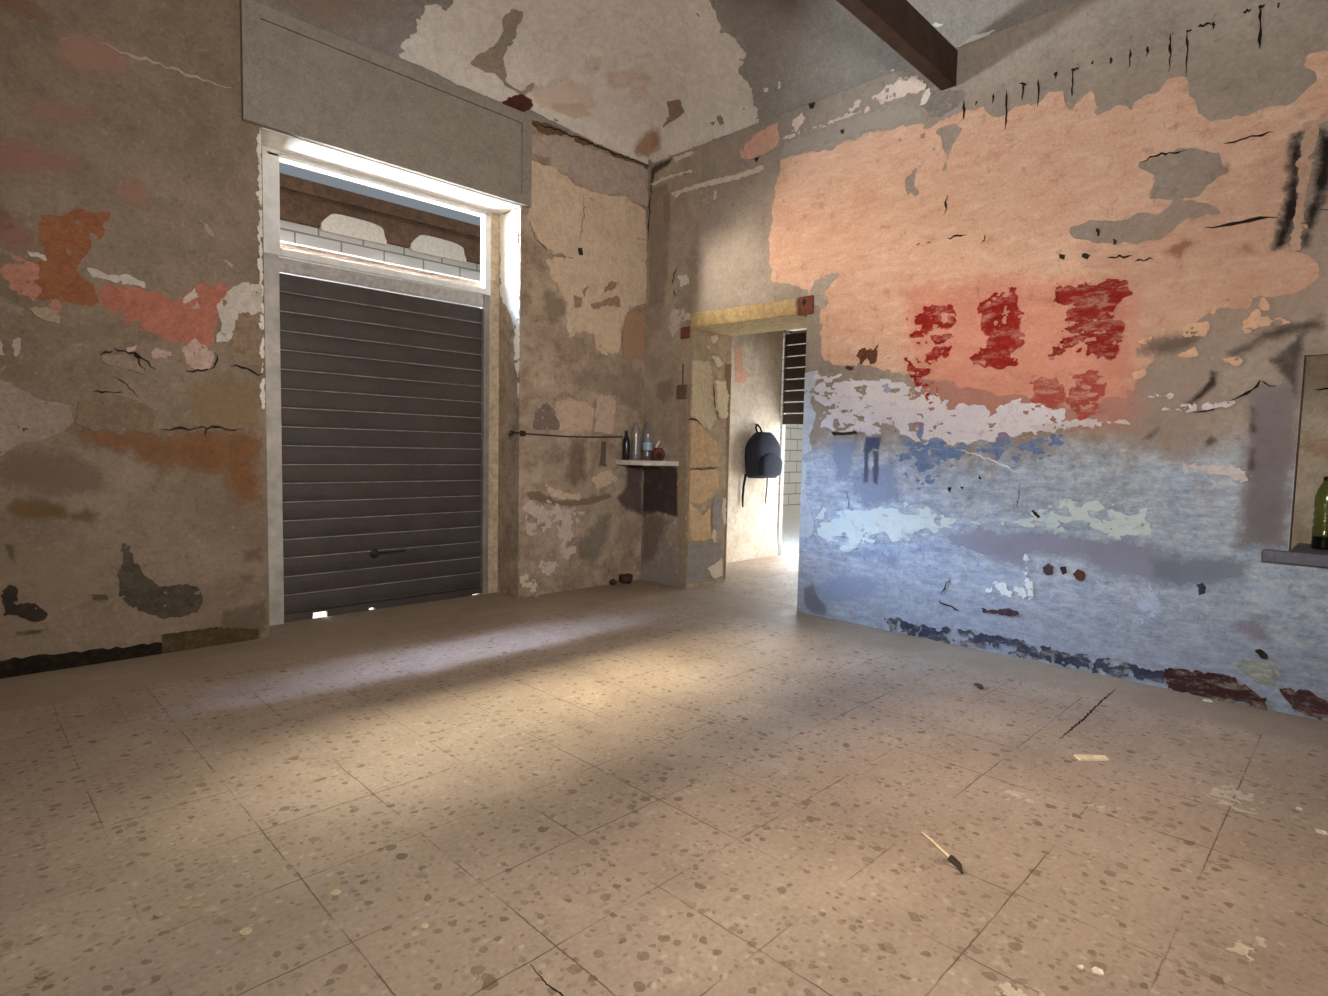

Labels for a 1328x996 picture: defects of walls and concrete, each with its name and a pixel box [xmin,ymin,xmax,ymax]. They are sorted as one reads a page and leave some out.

leakage [1301,129,1328,247]
peeling [0,128,265,409]
peeling [399,0,1328,492]
flaking render [669,308,750,582]
peeling [800,460,981,552]
peeling [1001,498,1151,541]
peeling [92,543,203,619]
peeling [886,617,950,644]
flaking render [982,608,1019,616]
flaking render [1043,563,1086,581]
peeling [1092,658,1164,683]
crack [530,964,564,996]